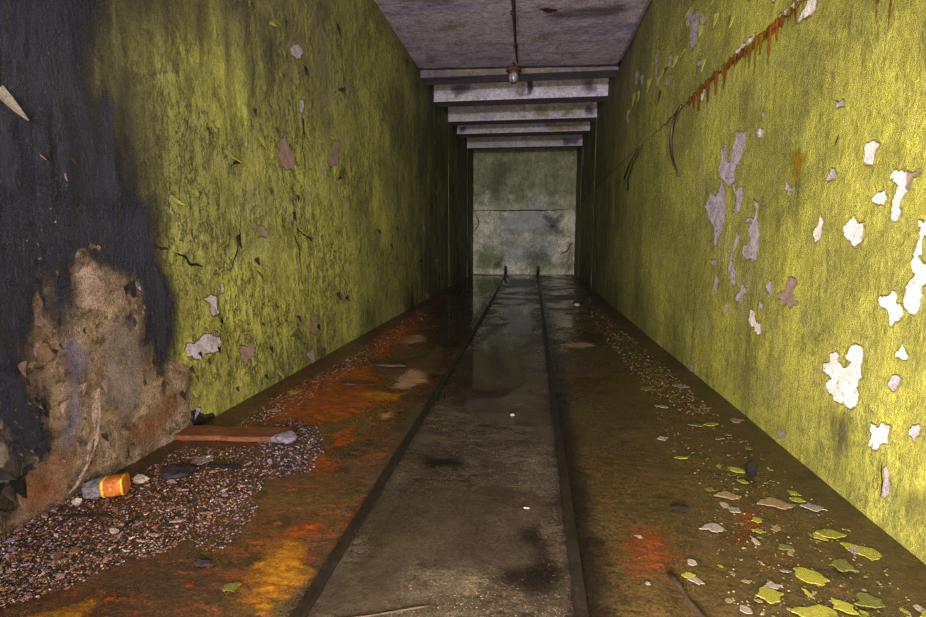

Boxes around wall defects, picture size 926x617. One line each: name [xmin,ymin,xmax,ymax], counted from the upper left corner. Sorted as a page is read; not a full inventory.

leakage [552,5,624,17]
crack [585,0,819,197]
peeling [705,112,765,336]
rust [688,0,804,111]
peeling [843,214,866,248]
peeling [863,139,882,167]
peeling [871,167,924,223]
peeling [877,219,926,328]
spalling [0,243,255,537]
leakage [479,206,611,617]
peeling [822,343,866,411]
peeling [867,421,892,452]